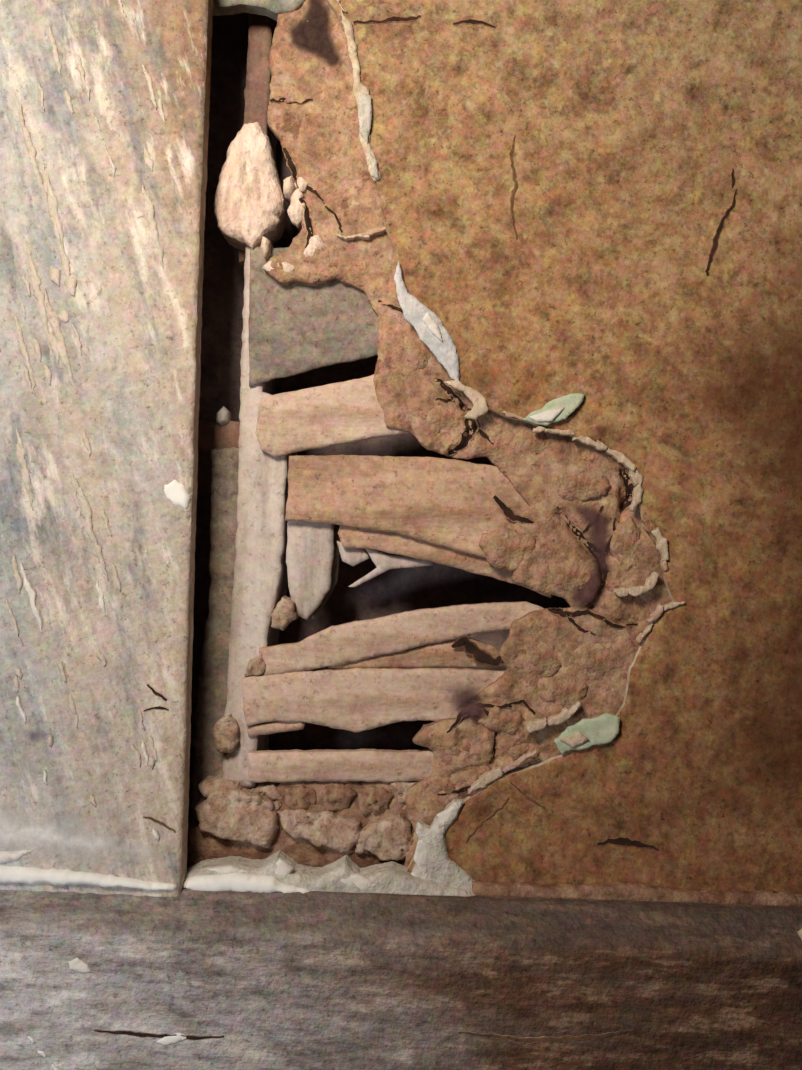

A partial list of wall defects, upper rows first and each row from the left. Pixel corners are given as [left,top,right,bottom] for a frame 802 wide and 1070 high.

crack [353,15,421,24]
crack [453,19,496,28]
crack [509,135,518,239]
crack [705,169,737,276]
flaking render [262,0,685,890]
crack [143,684,169,711]
crack [143,816,176,832]
crack [597,836,659,851]
crack [94,1030,224,1040]